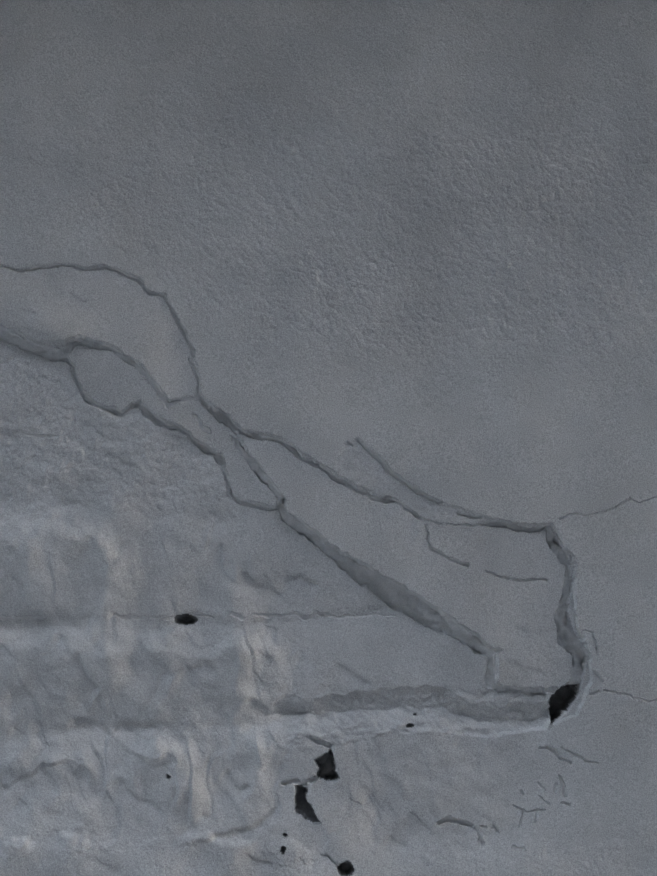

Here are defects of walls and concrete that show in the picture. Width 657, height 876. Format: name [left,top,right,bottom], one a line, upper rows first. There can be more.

spalling [0,325,550,855]
crack [0,264,657,725]
crack [436,746,598,851]